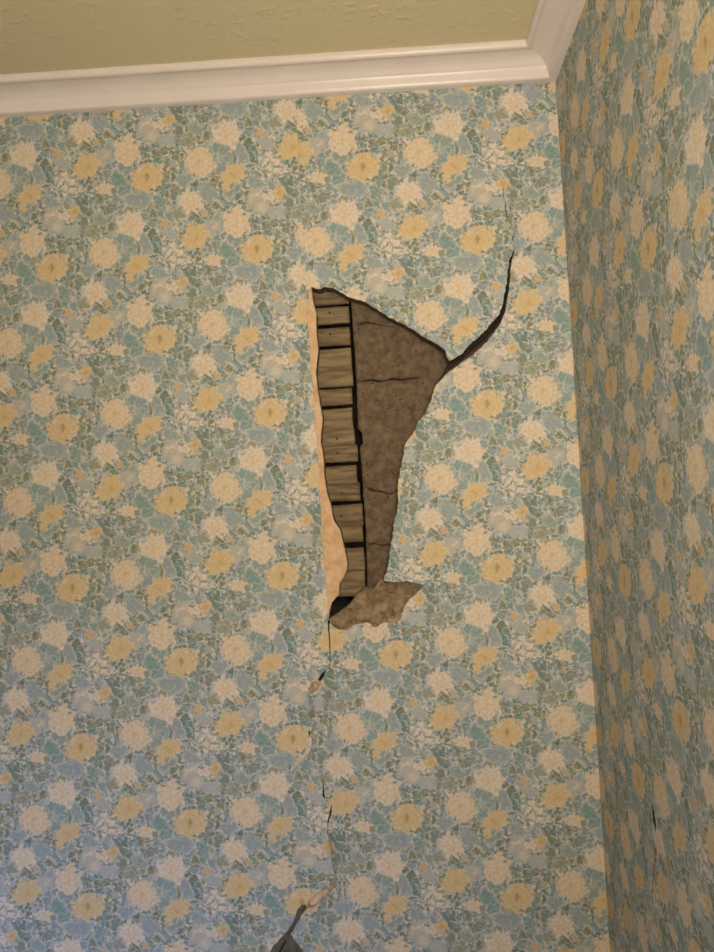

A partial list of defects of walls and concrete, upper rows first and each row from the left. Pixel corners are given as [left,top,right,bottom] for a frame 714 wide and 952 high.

crack [437,194,515,383]
flaking render [307,288,447,633]
flaking render [270,904,307,952]